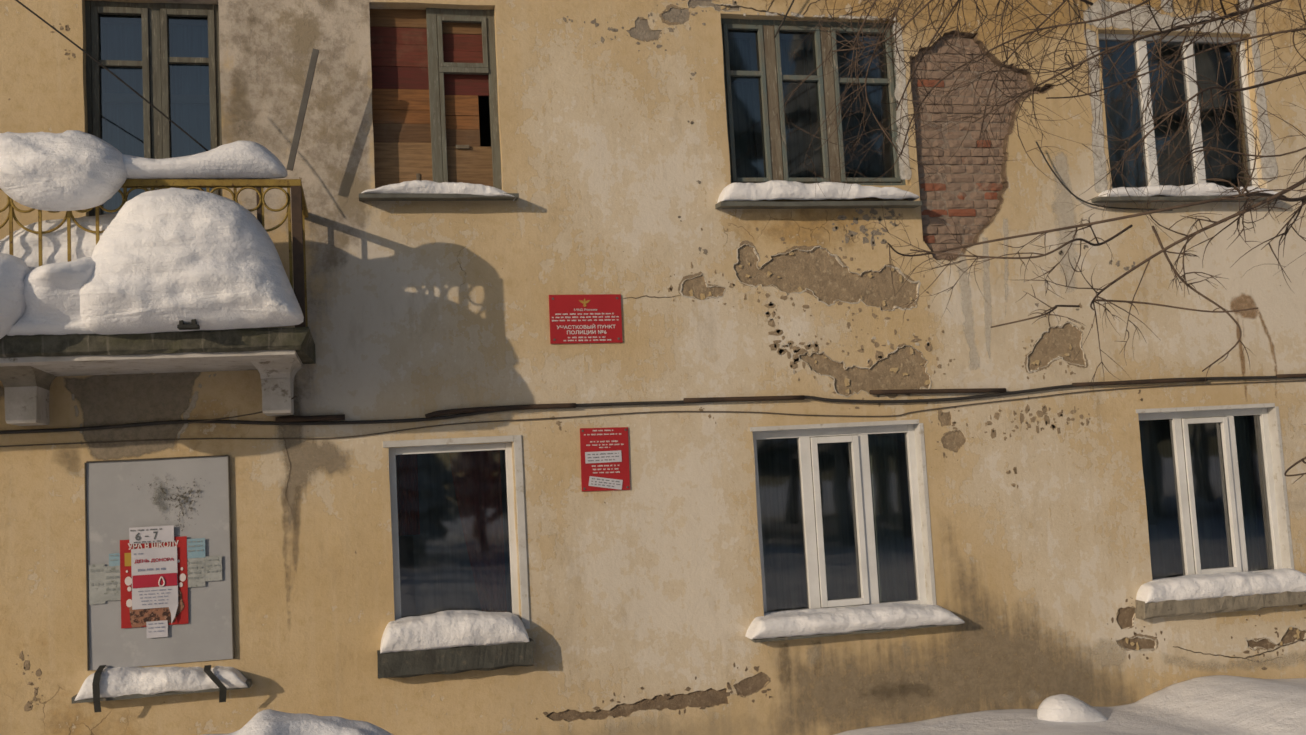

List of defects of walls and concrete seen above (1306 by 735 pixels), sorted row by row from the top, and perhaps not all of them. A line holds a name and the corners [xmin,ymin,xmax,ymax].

flaking render [563,0,741,51]
flaking render [910,30,1057,261]
flaking render [668,208,1093,461]
water stain [279,387,345,524]
flaking render [536,663,773,722]
water stain [788,575,1126,732]
flaking render [1107,597,1165,660]
flaking render [1231,605,1306,670]